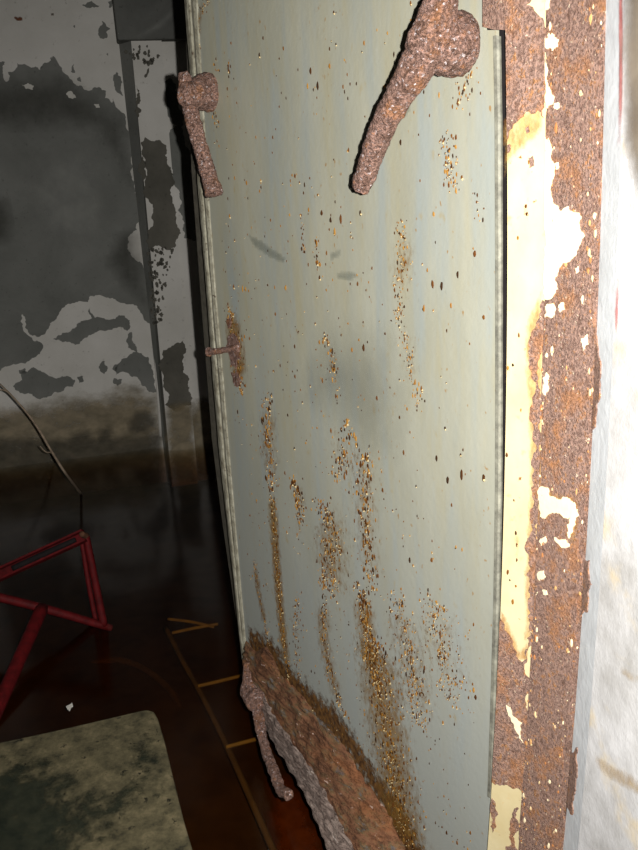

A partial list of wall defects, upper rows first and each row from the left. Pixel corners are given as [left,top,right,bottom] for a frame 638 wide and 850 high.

peeling [98,21,110,39]
peeling [124,45,160,78]
peeling [0,56,196,409]
peeling [543,137,585,318]
rust [223,279,286,396]
rust [390,219,443,419]
peeling [542,372,550,395]
rust [492,0,606,850]
peeling [537,486,579,548]
rust [237,392,477,850]
rust [490,799,498,833]